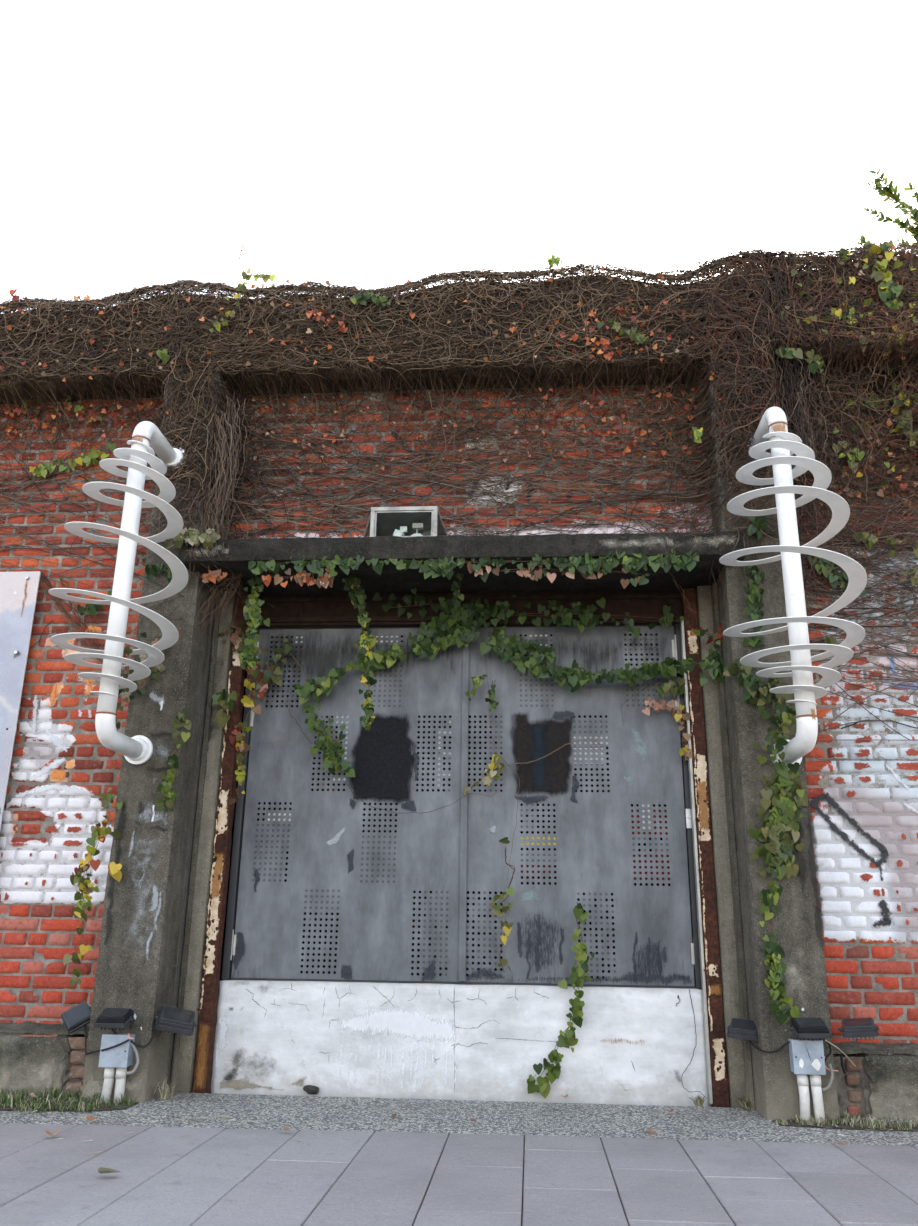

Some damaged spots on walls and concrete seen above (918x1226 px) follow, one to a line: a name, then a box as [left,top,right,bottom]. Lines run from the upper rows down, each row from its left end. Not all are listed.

peeling [837,572,918,626]
peeling [827,635,918,717]
peeling [828,722,872,798]
peeling [896,748,918,781]
peeling [1,812,101,859]
rust [697,781,709,830]
rust [212,854,223,898]
peeling [861,863,918,925]
rust [194,1025,209,1087]
crack [246,983,557,1088]